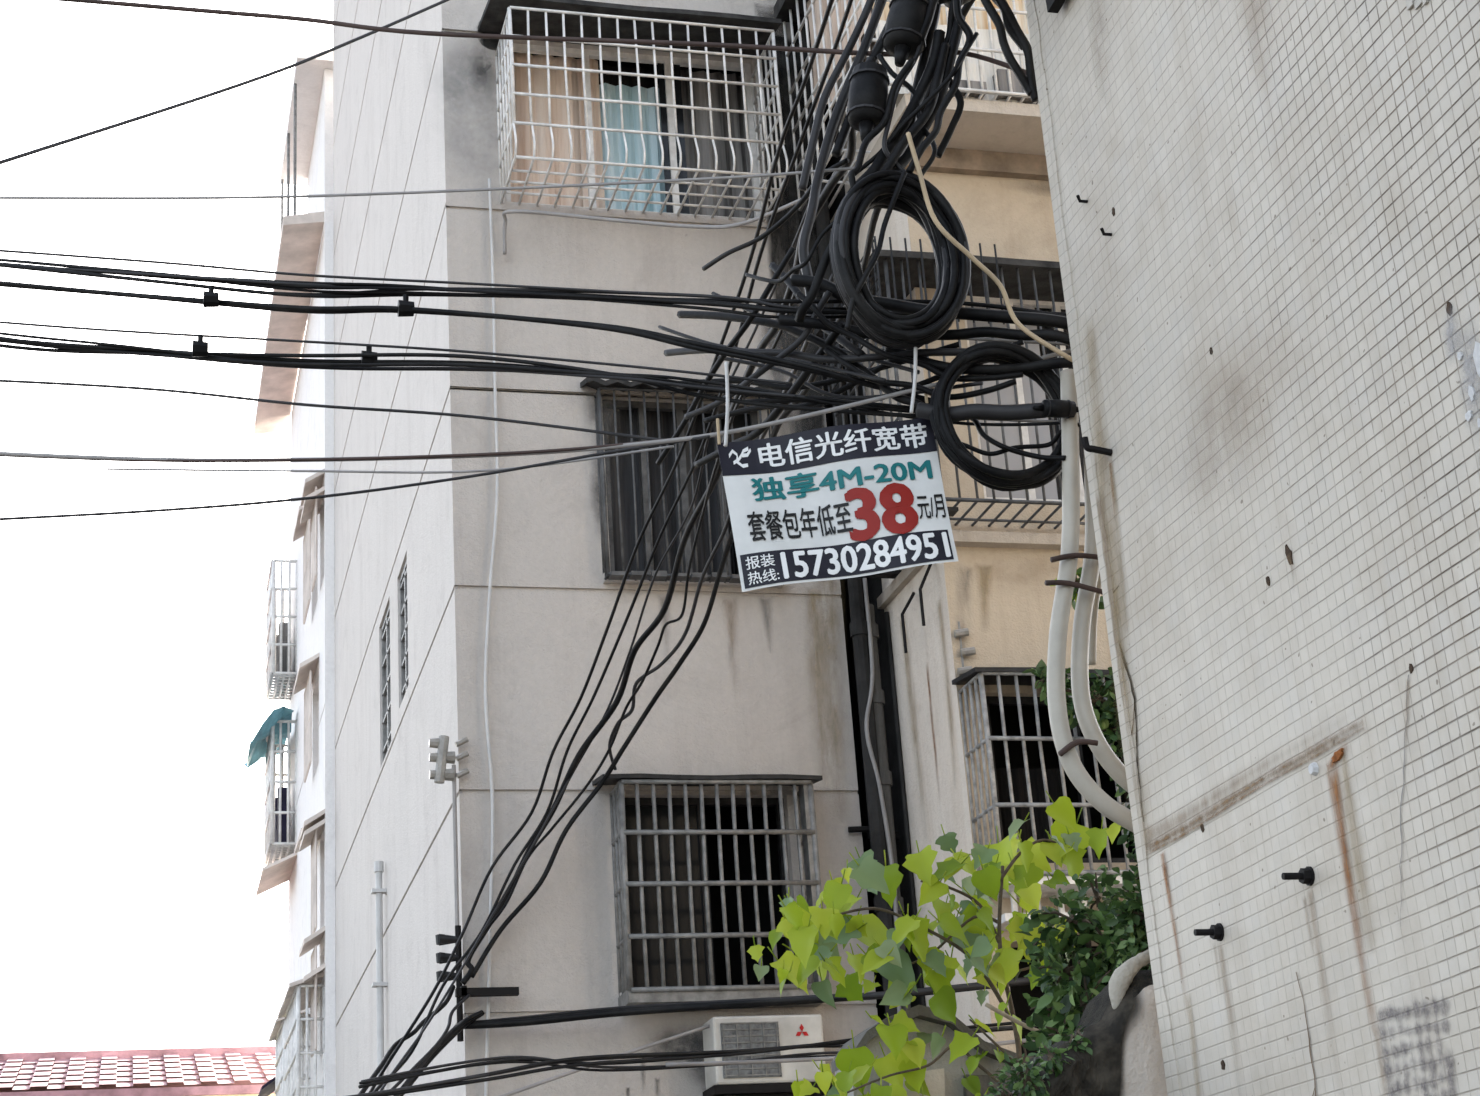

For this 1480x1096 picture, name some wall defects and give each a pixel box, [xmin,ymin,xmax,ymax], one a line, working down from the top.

corrosion [1150,726,1361,957]